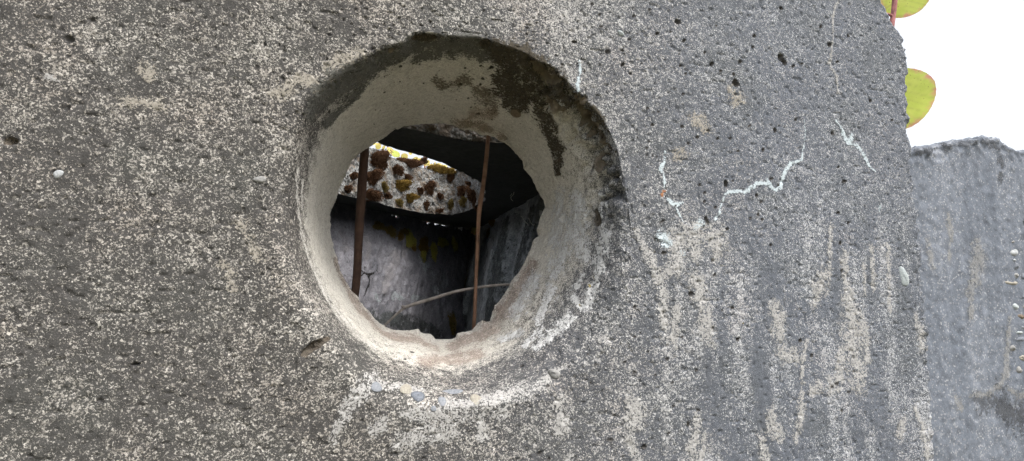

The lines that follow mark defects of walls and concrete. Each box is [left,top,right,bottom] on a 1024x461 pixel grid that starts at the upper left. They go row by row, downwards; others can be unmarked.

water stain [430,71,500,115]
crack [659,150,684,223]
crack [714,120,806,221]
crack [835,120,876,172]
water stain [633,216,732,350]
water stain [755,222,892,461]
water stain [914,314,928,353]
water stain [623,392,650,461]
water stain [683,411,709,461]
water stain [896,403,932,461]